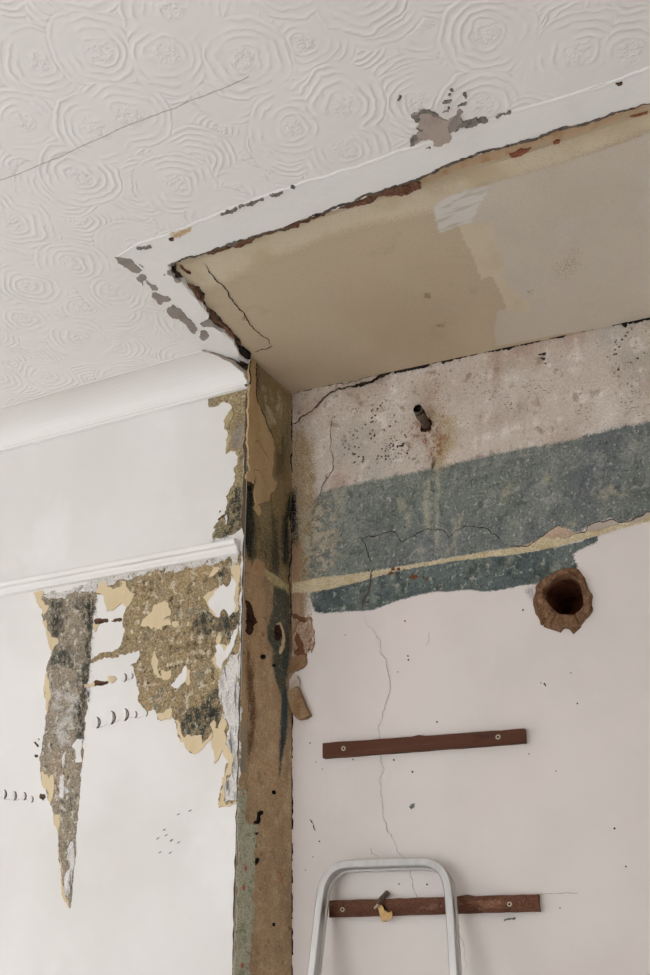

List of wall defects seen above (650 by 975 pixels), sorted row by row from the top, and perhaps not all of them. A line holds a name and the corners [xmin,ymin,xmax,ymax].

crack [0,76,249,181]
peeling [410,88,511,149]
peeling [220,185,295,216]
peeling [115,245,213,341]
crack [206,266,273,352]
rust [407,399,467,475]
crack [291,317,650,513]
flaking render [292,320,650,582]
flaking render [44,549,240,599]
water stain [211,358,320,778]
peeling [91,708,148,729]
crack [358,511,650,897]